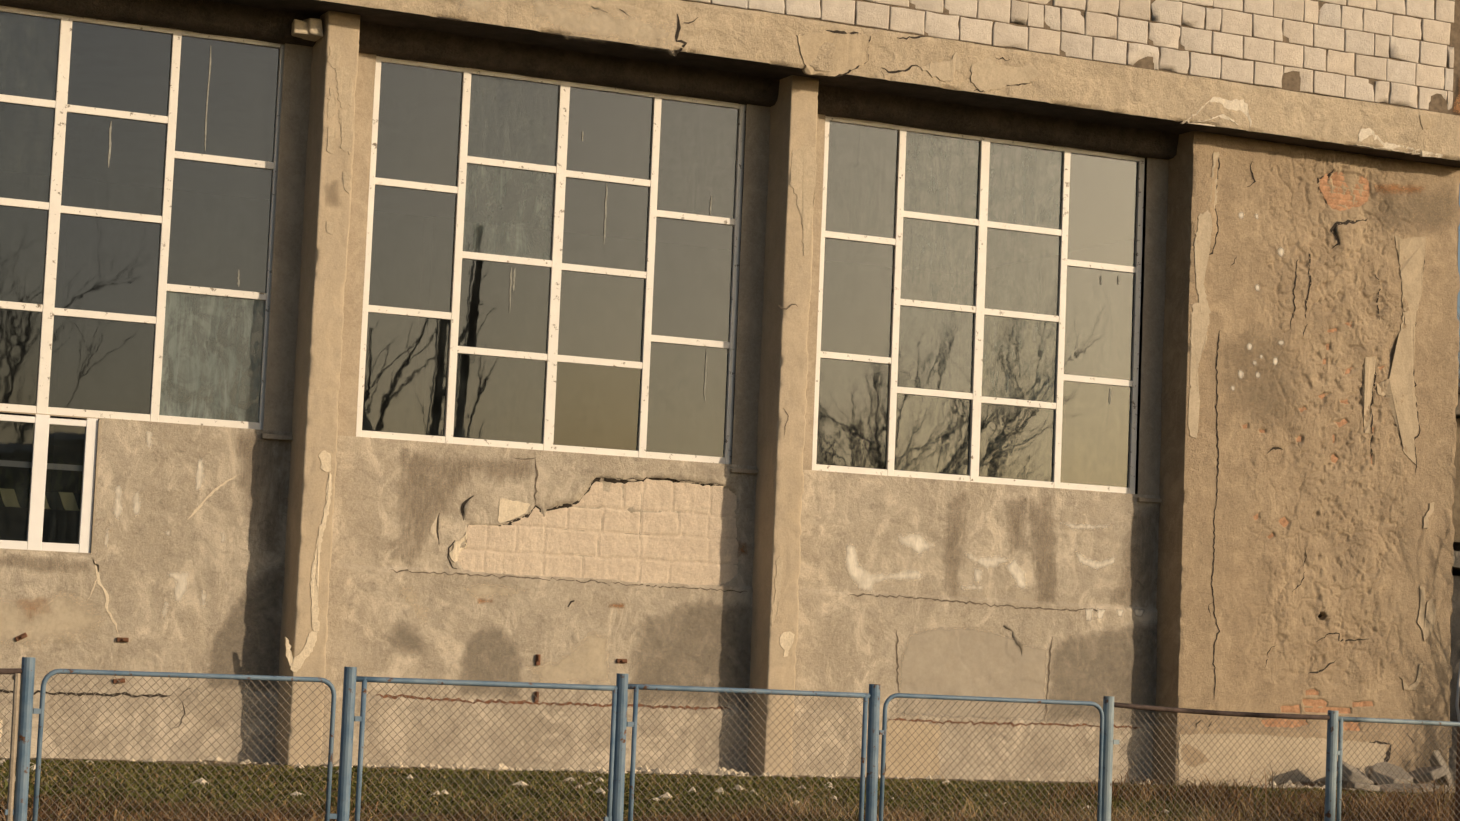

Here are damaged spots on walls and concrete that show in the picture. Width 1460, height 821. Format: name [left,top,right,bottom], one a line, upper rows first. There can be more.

peeling [1180,97,1252,131]
crack [1208,158,1256,268]
peeling [1298,236,1426,465]
crack [391,457,747,607]
flaking render [449,479,746,585]
leakage [846,534,929,590]
leakage [962,554,1026,589]
leakage [898,609,1154,721]
leakage [1077,553,1114,568]
crack [1196,331,1220,727]
flaking render [1262,689,1373,731]
peeling [1417,586,1436,641]